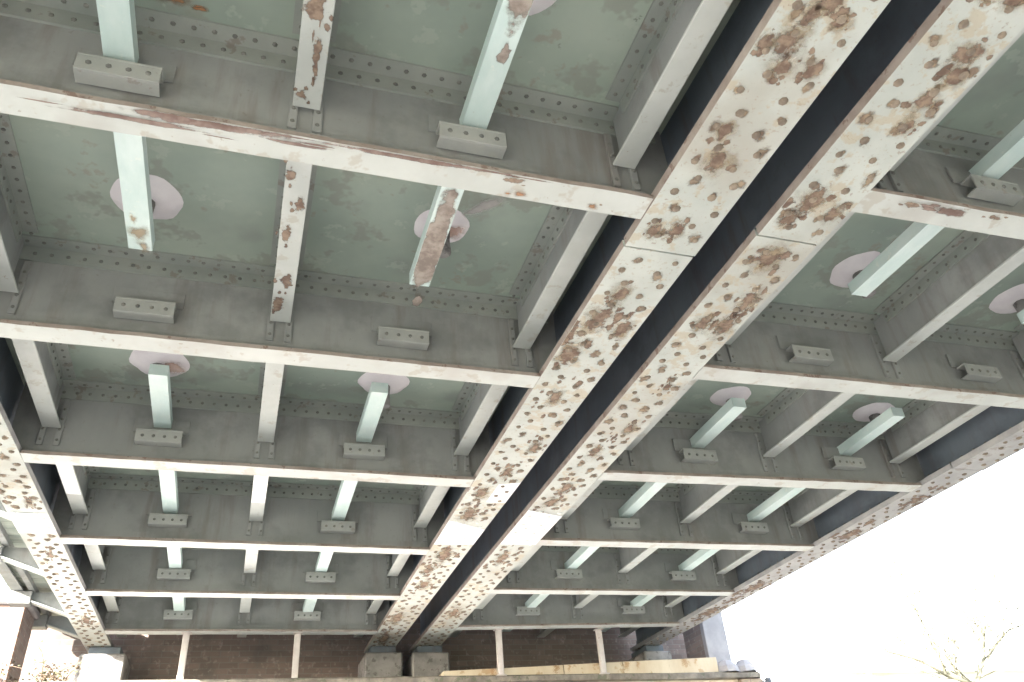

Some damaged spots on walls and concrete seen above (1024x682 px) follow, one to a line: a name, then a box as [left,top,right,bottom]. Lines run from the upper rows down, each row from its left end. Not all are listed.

corrosion [496,0,533,64]
corrosion [899,202,966,217]
corrosion [412,188,458,306]
corrosion [587,398,662,464]
corrosion [28,534,100,642]